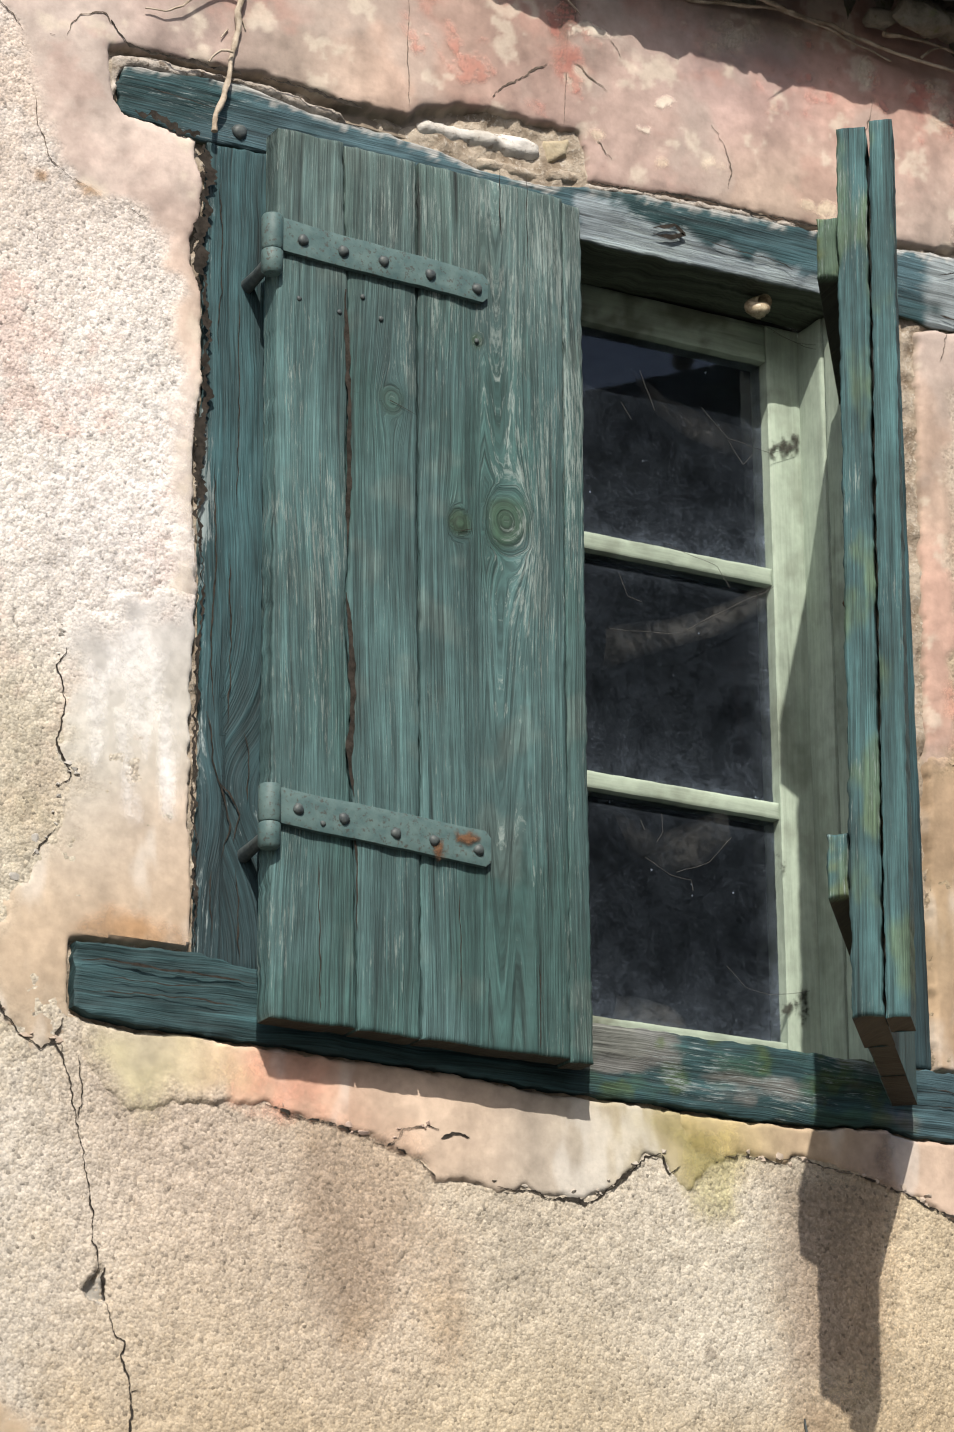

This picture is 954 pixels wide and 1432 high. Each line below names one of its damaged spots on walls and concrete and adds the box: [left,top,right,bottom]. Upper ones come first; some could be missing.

peeling [546,3,608,92]
spalling [844,0,954,57]
flaking render [656,96,673,108]
peeling [904,82,954,129]
flaking render [371,119,579,185]
flaking render [803,200,836,216]
crack [56,647,72,787]
flaking render [0,586,954,1221]
crack [0,1003,99,1269]